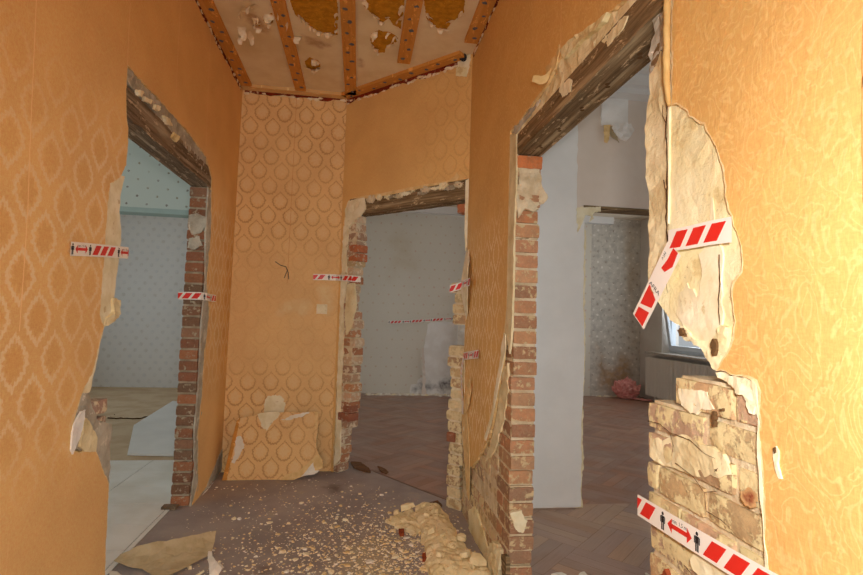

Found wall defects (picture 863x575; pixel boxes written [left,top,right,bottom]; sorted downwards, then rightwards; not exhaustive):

peeling [237,0,340,46]
peeling [362,0,405,56]
peeling [424,0,465,34]
spalling [456,54,471,77]
spalling [512,0,636,135]
flaking render [601,98,634,143]
flaking render [645,0,768,575]
spalling [70,393,112,482]
spalling [462,363,510,575]
crack [648,421,725,524]